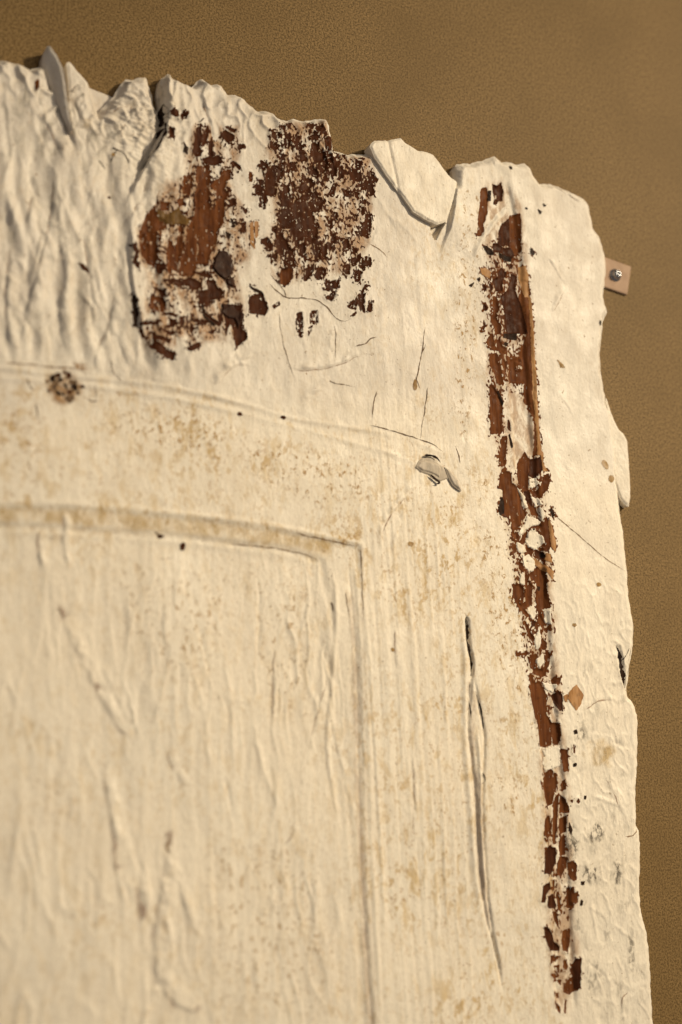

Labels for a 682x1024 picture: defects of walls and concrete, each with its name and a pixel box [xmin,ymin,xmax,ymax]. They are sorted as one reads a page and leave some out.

peeling [128,105,379,361]
crack [465,618,484,729]
peeling [469,183,587,1014]
crack [616,646,631,689]